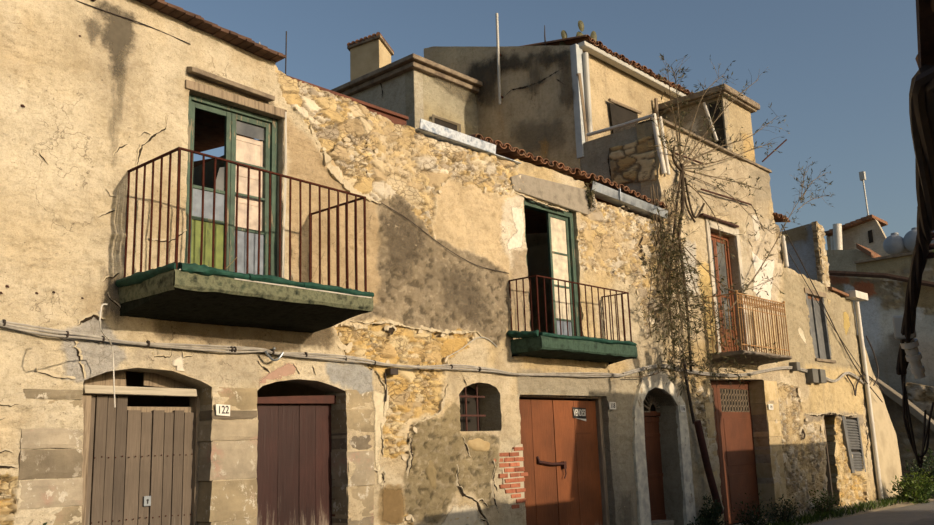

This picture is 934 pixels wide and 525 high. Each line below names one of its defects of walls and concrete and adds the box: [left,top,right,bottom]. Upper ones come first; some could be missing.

crack [506,69,561,95]
crack [112,113,168,174]
spalling [275,65,524,238]
crack [97,188,116,217]
peeling [507,207,524,250]
crack [0,402,19,420]
spalling [334,319,482,485]
crack [0,448,18,469]
spalling [0,474,19,525]
spalling [398,514,414,525]
crack [456,436,499,525]
flaking render [494,444,528,509]